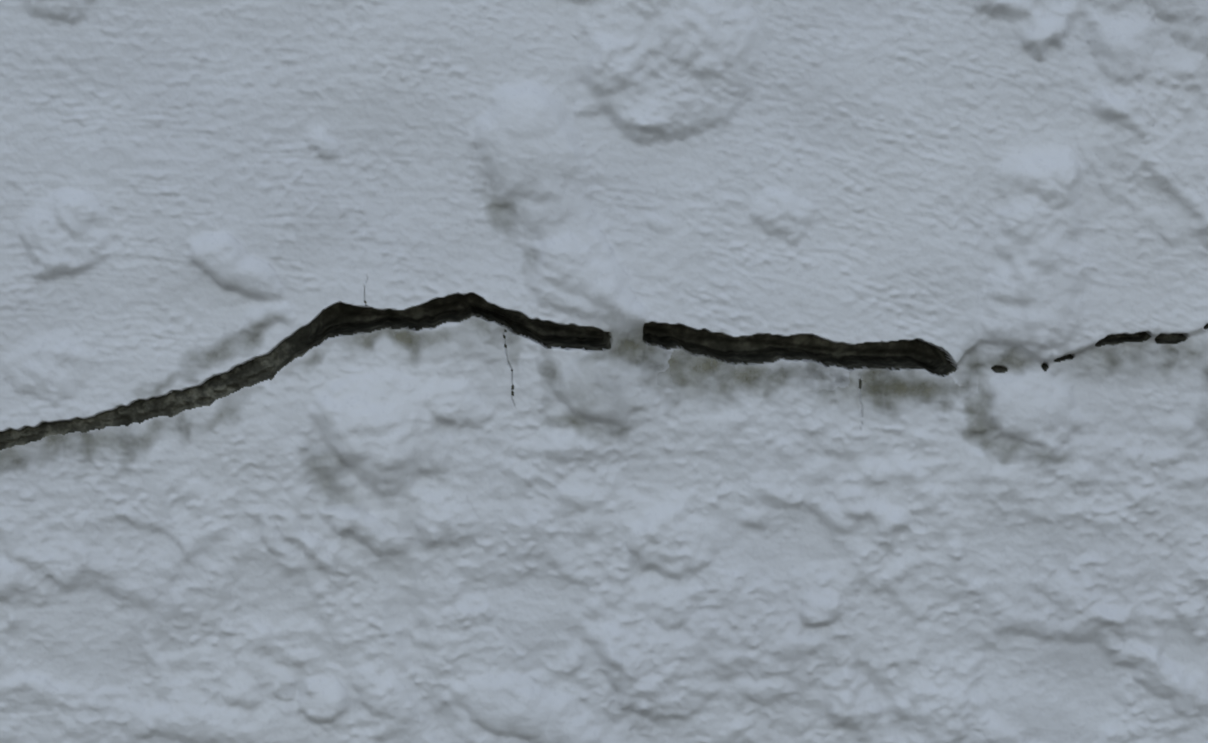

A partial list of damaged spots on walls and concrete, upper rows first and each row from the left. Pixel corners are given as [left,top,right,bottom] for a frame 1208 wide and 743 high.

crack [0,293,611,450]
crack [643,322,957,389]
crack [991,365,1008,373]
crack [1041,324,1208,371]